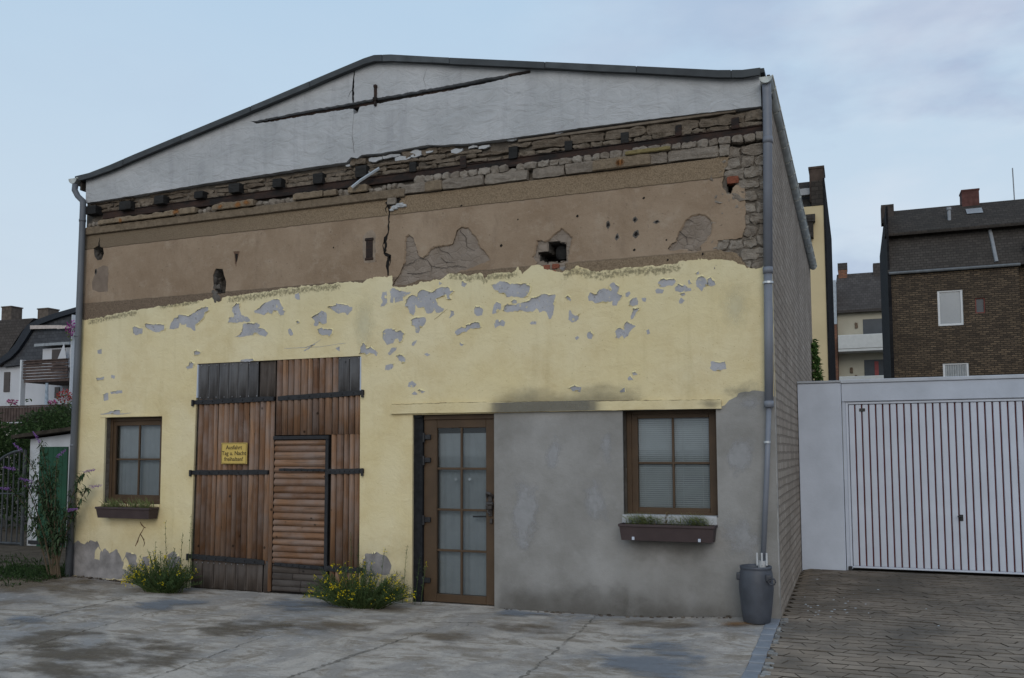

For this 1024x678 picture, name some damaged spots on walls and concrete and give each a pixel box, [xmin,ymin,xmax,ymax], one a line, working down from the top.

crack [348,71,356,150]
spalling [727,176,739,193]
crack [382,202,391,276]
flaking render [532,228,573,272]
peeling [132,269,226,335]
peeling [228,298,285,337]
peeling [288,303,352,351]
flaking render [359,226,490,370]
peeling [455,281,580,346]
peeling [588,271,716,339]
peeling [72,538,149,579]
peeling [362,552,391,578]